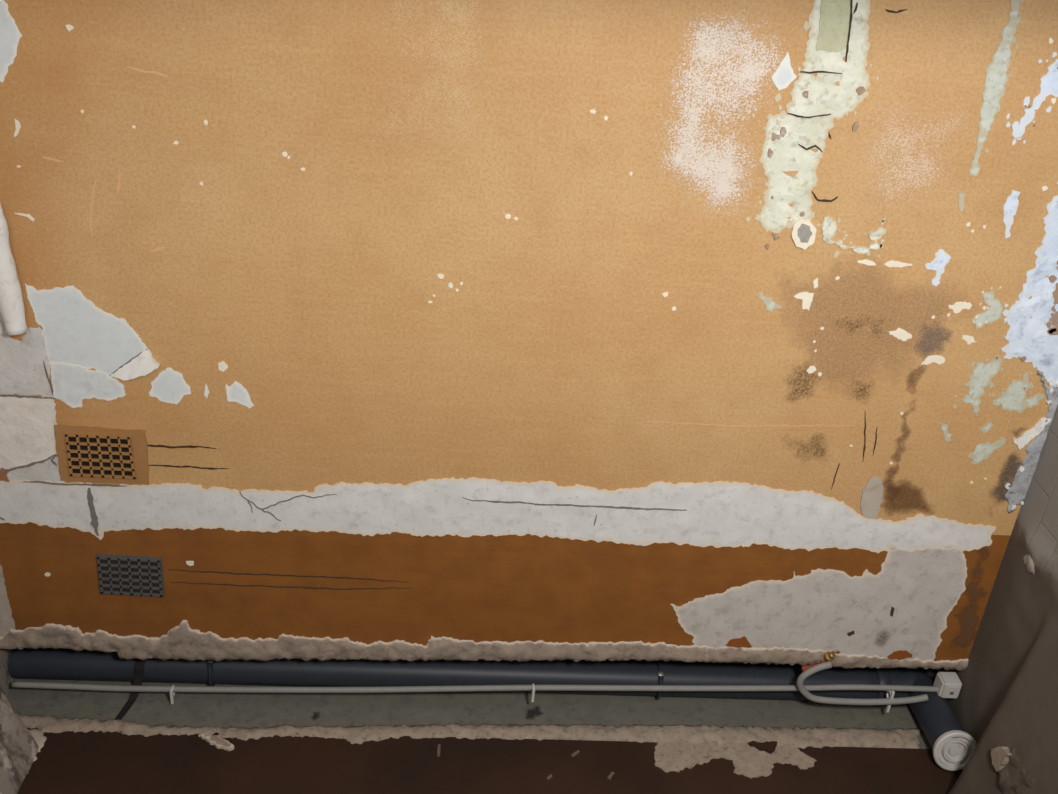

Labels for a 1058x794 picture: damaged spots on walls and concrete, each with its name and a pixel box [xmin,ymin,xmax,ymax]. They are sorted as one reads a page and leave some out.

peeling [0,0,22,83]
efflorescence [649,1,794,224]
peeling [746,0,912,268]
peeling [958,0,1058,233]
peeling [925,249,951,287]
peeling [931,182,1058,513]
crack [0,454,124,536]
crack [147,445,228,470]
crack [240,492,337,521]
peeling [0,284,996,671]
water stain [886,423,927,511]
spalling [17,713,921,779]